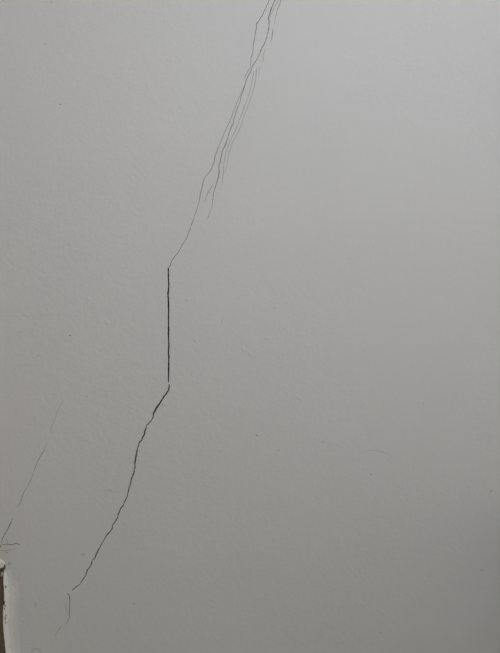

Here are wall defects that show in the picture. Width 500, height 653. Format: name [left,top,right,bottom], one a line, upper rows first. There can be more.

crack [54,0,281,637]